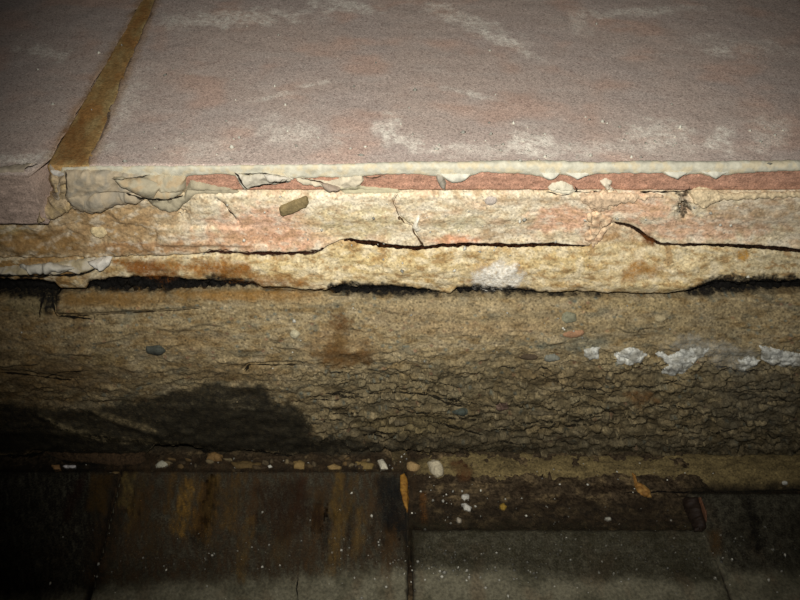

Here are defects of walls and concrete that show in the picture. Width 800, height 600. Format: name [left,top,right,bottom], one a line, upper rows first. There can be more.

peeling [235,172,364,193]
crack [204,187,598,256]
crack [614,222,800,253]
peeling [0,256,113,278]
crack [1,370,90,380]
crack [244,363,300,371]
damp [584,347,601,360]
damp [614,346,709,376]
damp [738,345,800,371]
crack [310,391,494,407]
damp [0,383,800,597]